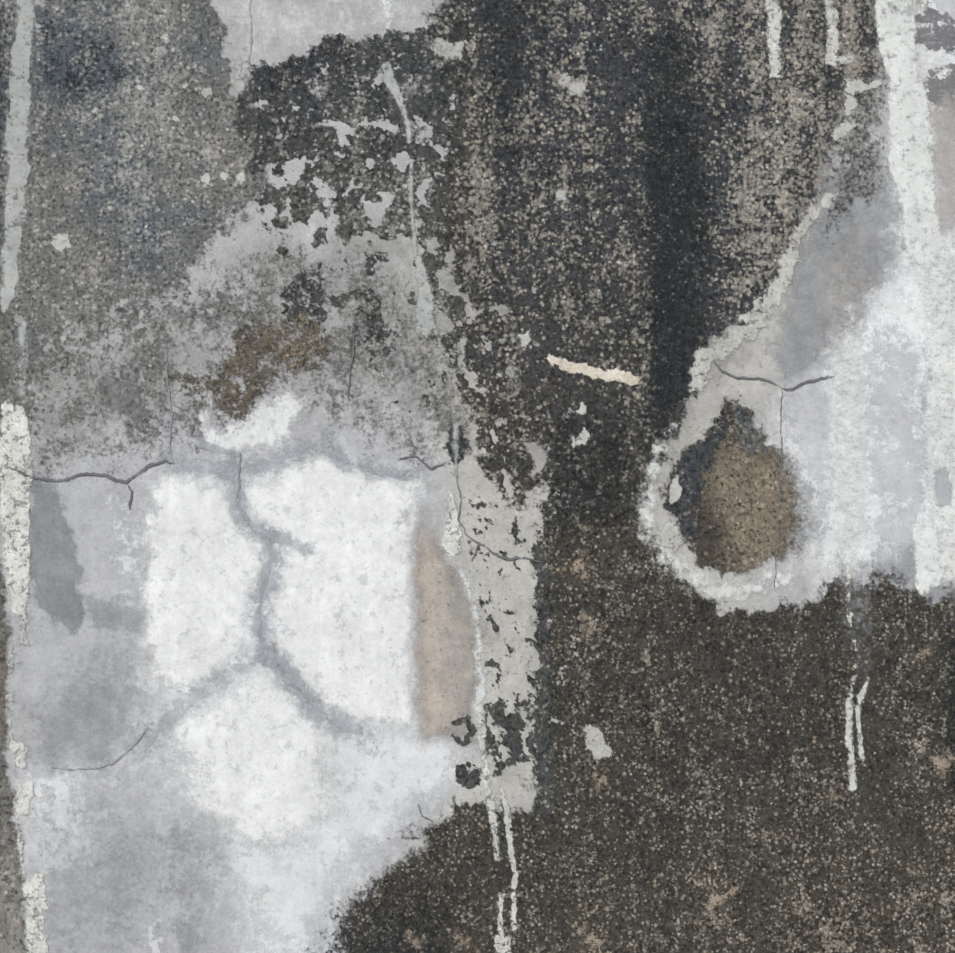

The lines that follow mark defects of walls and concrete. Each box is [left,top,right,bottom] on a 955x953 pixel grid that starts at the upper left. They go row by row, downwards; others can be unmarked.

peeling [936,0,955,30]
water stain [833,331,869,569]
crack [714,361,835,588]
water stain [470,500,493,535]
water stain [509,516,526,546]
crack [8,342,542,770]
water stain [413,535,486,746]
water stain [483,658,501,684]
water stain [481,698,532,776]
water stain [525,730,540,761]
water stain [455,761,482,789]